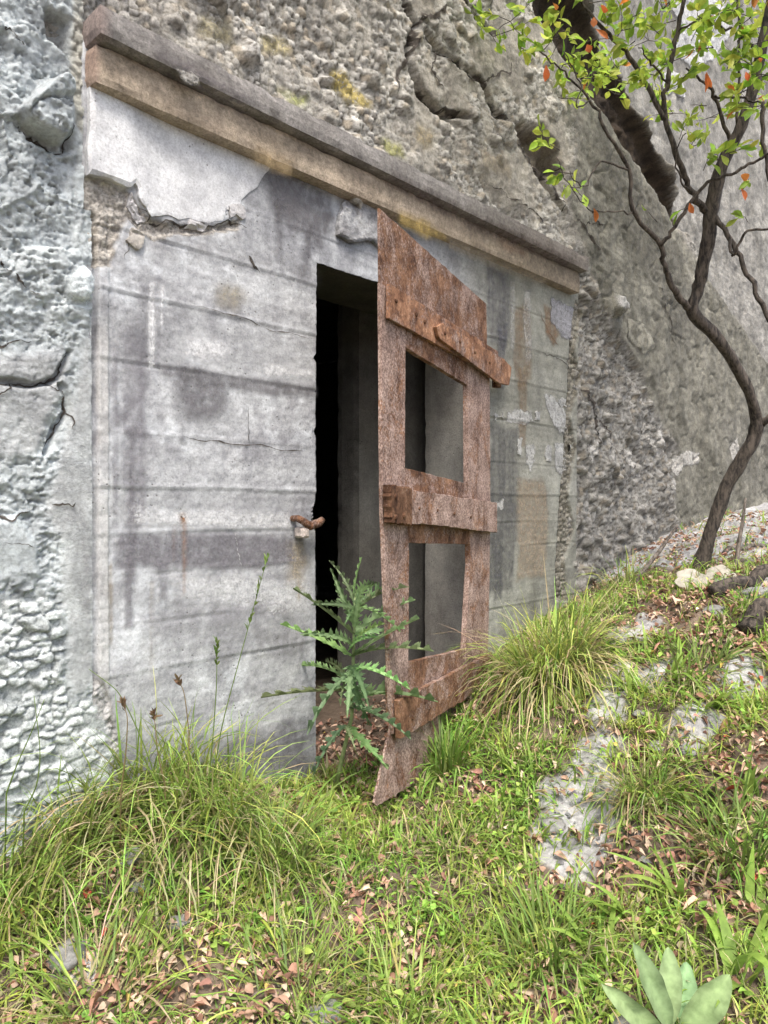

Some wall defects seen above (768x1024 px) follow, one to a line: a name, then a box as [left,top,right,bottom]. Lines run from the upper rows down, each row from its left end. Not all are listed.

peeling [83,87,270,268]
crack [395,0,603,256]
crack [0,353,75,454]
crack [184,408,301,451]
spalling [494,298,599,601]
water stain [118,482,307,610]